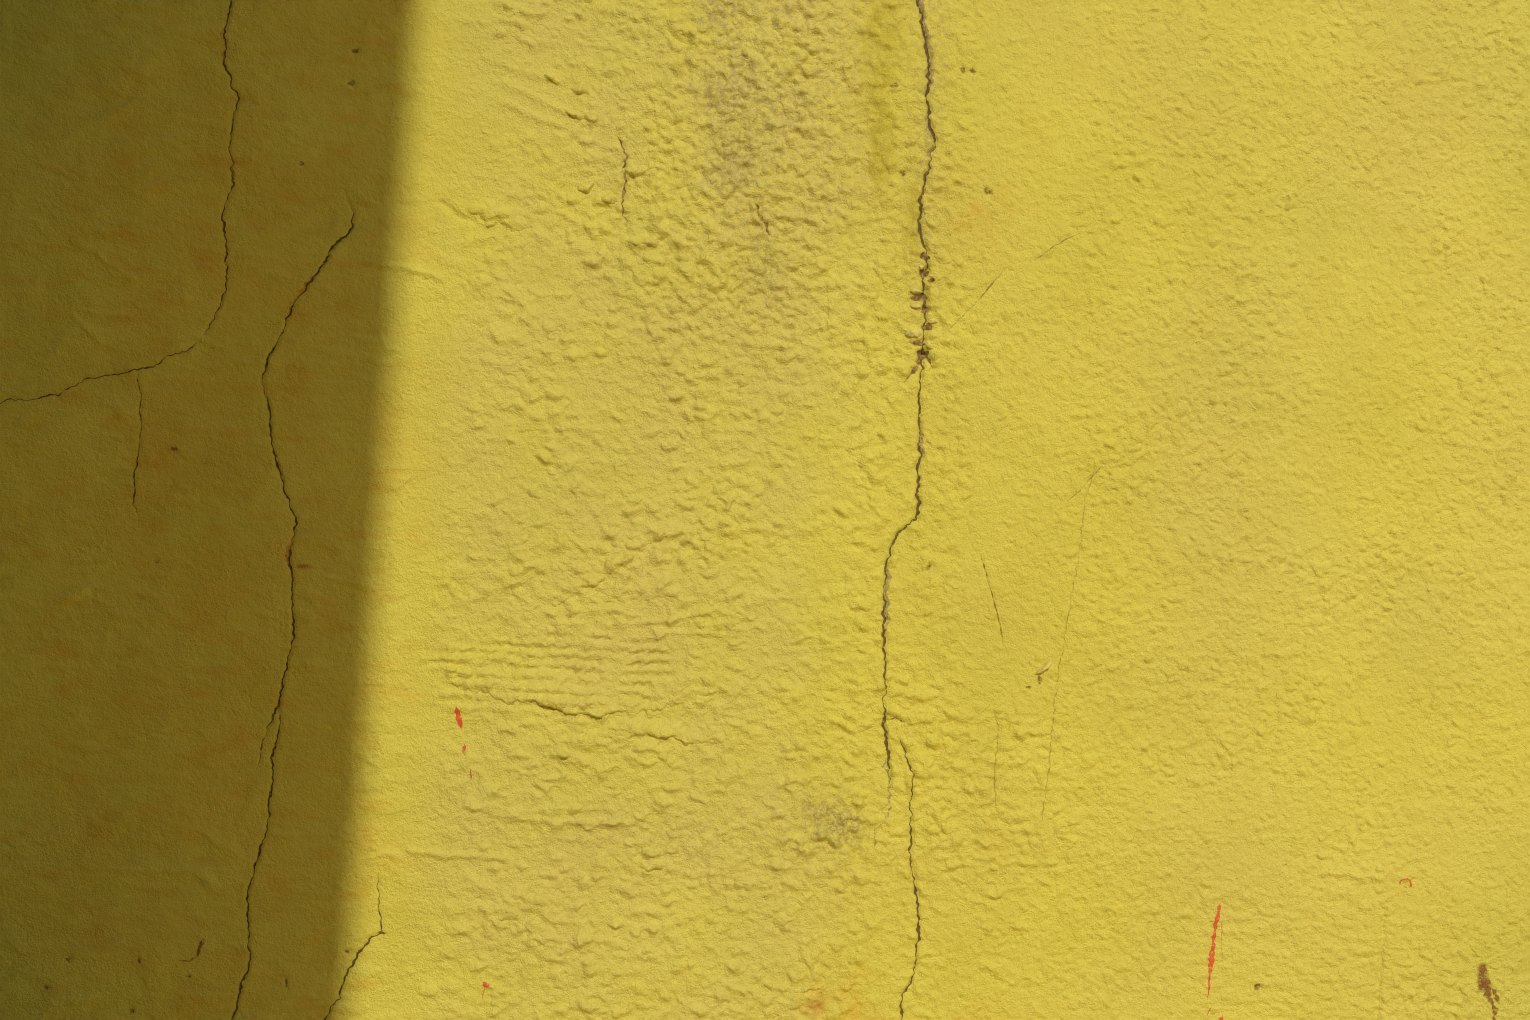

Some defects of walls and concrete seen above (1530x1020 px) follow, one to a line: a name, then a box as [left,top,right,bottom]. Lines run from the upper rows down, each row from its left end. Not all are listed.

crack [0,0,240,520]
crack [231,207,354,1020]
crack [324,873,386,1020]
crack [881,0,938,1019]